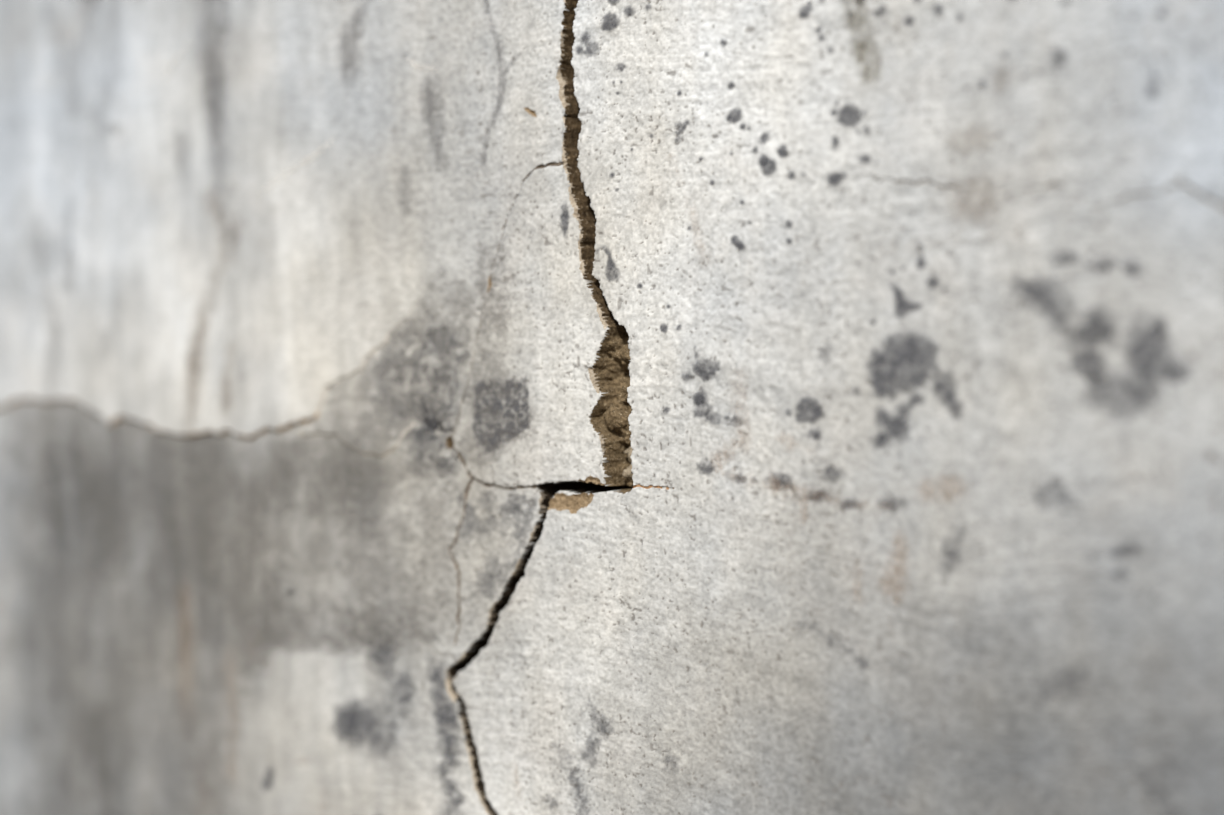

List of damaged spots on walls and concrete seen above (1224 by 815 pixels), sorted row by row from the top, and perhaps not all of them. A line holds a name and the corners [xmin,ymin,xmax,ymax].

leakage [727,109,805,178]
leakage [828,173,845,185]
leakage [831,102,869,133]
leakage [891,244,946,317]
leakage [472,379,529,452]
crack [445,0,674,815]
leakage [871,335,959,447]
leakage [1074,322,1184,405]
leakage [336,708,380,742]
leakage [432,669,456,788]